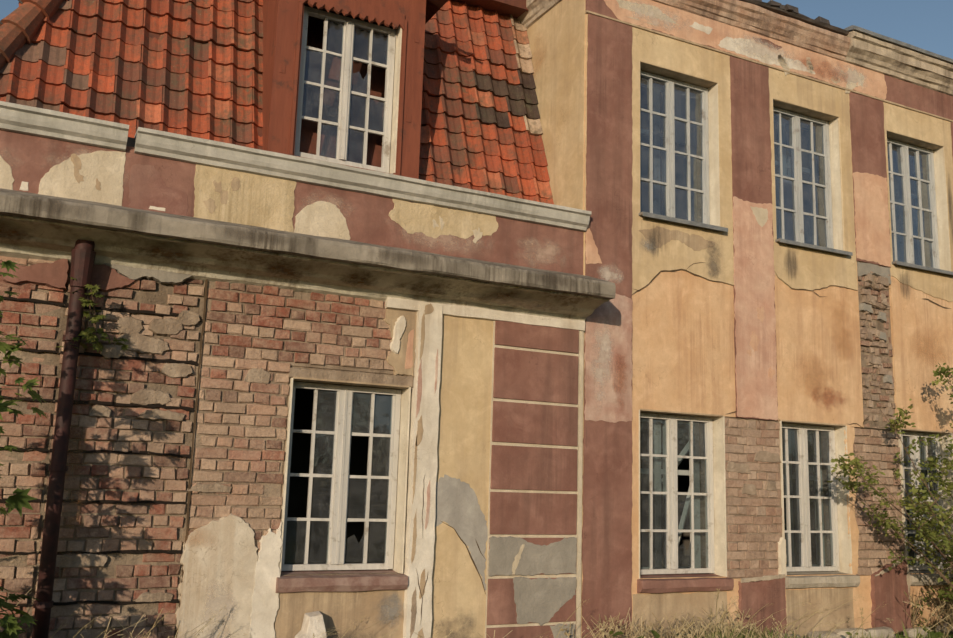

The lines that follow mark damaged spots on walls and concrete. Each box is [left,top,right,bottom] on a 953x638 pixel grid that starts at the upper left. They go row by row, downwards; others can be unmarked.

peeling [604,0,887,100]
spalling [0,150,126,206]
spalling [194,164,350,240]
spalling [388,198,499,244]
crack [633,262,732,294]
crack [775,272,851,297]
flaking render [48,278,434,638]
spalling [488,536,577,638]